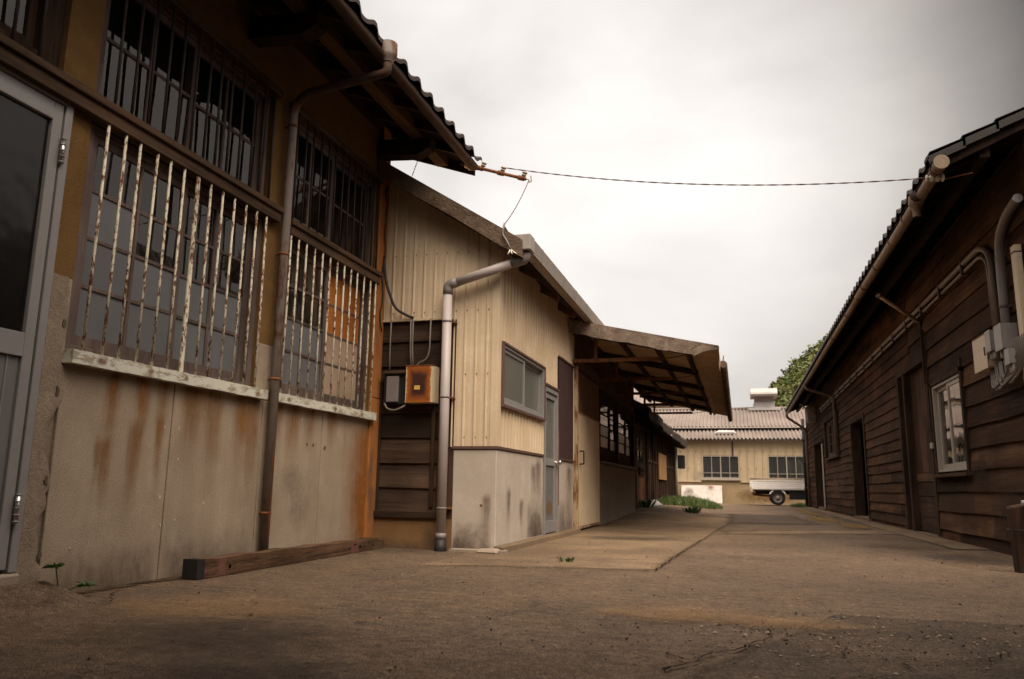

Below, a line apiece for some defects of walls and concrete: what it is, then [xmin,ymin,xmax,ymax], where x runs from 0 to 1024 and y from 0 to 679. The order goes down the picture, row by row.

rust [186,377,207,416]